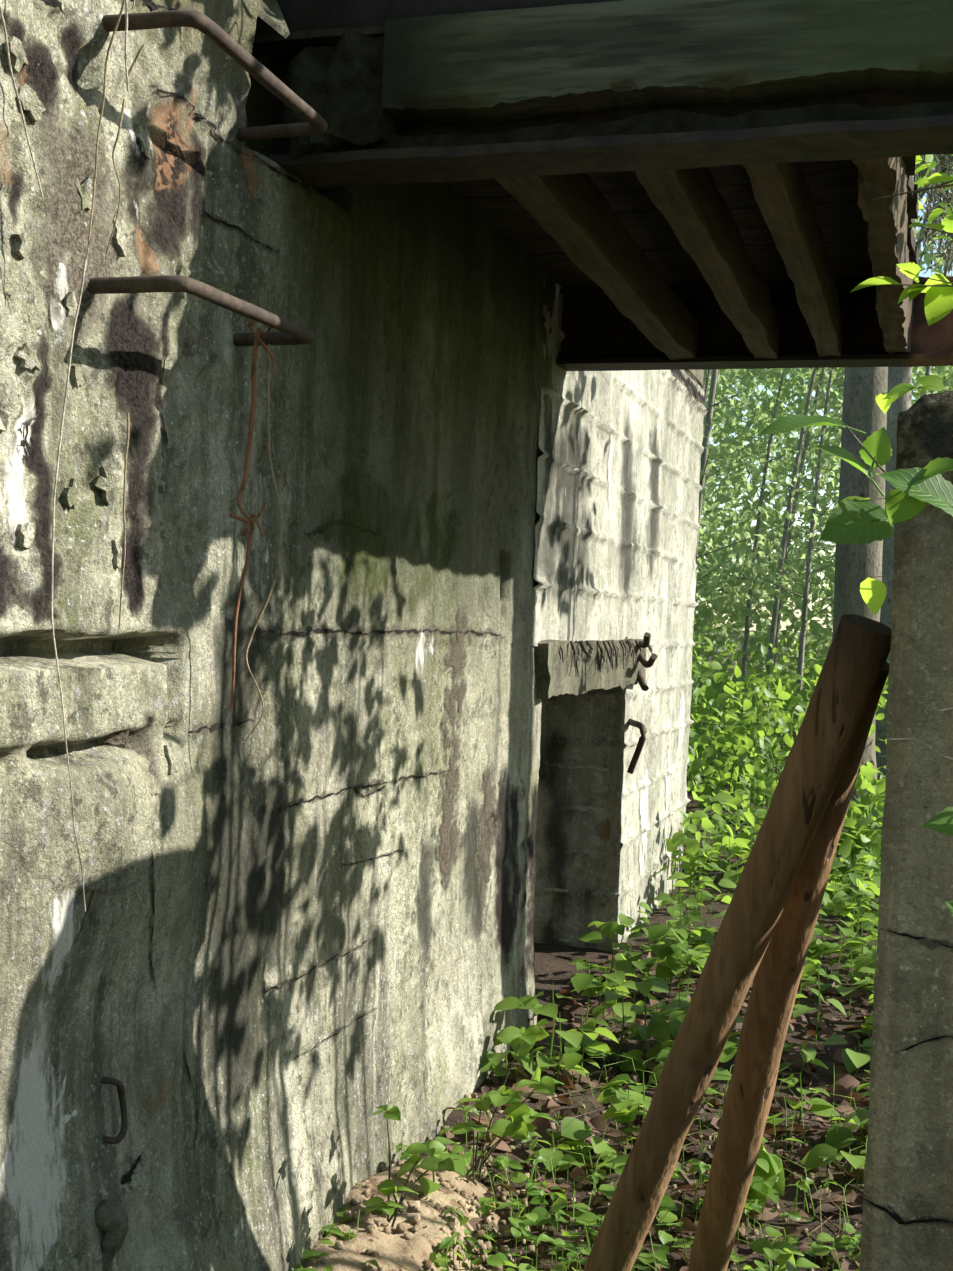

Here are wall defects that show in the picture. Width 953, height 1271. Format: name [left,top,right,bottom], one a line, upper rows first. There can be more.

rust [150,105,191,188]
rust [136,228,159,272]
damp [105,298,170,614]
crack [253,625,504,641]
crack [189,719,254,739]
crack [258,768,456,817]
crack [344,850,402,866]
crack [878,927,953,949]
crack [257,938,376,995]
crack [293,1008,377,1059]
crack [858,1196,953,1226]